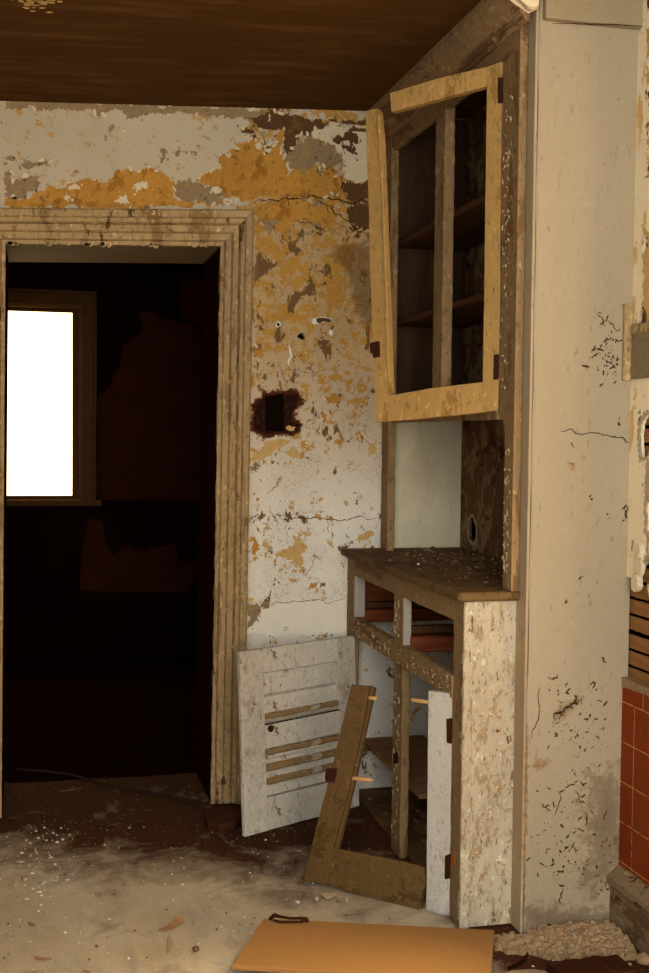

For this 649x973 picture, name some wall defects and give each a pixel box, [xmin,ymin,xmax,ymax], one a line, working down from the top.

peeling [3,101,369,248]